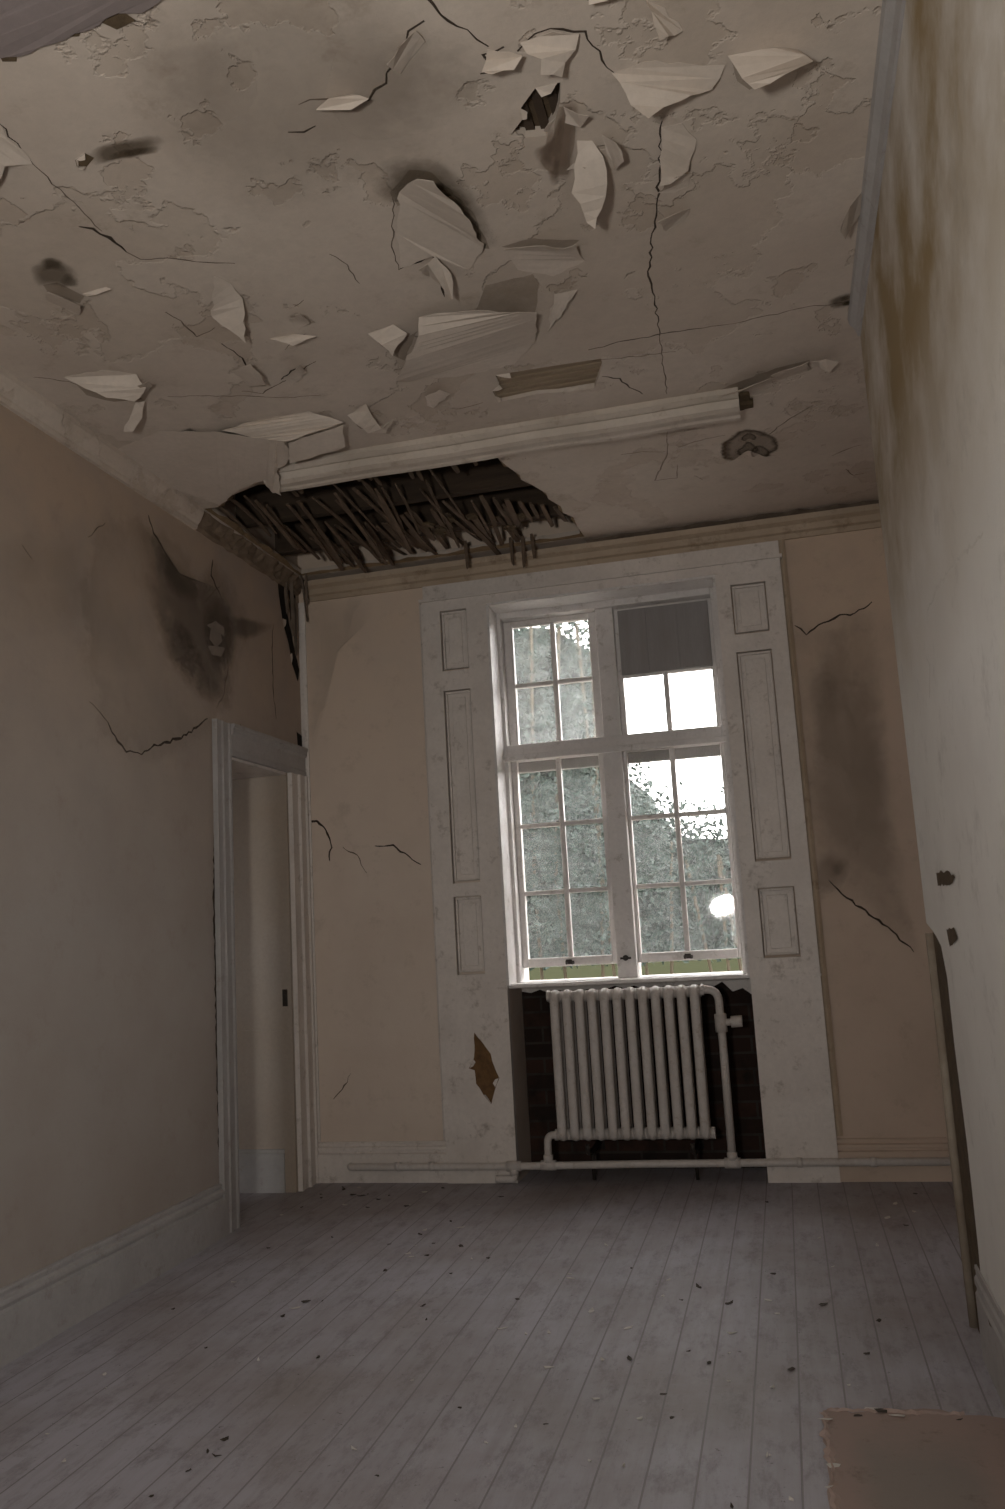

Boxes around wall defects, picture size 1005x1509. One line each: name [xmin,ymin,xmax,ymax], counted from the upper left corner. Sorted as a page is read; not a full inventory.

peeling [0,0,161,62]
crack [366,0,614,101]
peeling [316,94,369,110]
spalling [75,152,94,170]
crack [0,124,235,264]
crack [391,198,445,297]
peeling [368,170,602,408]
crack [589,121,834,394]
peeling [64,370,393,505]
crack [90,560,277,755]
crack [829,881,914,952]
peeling [469,1033,499,1104]